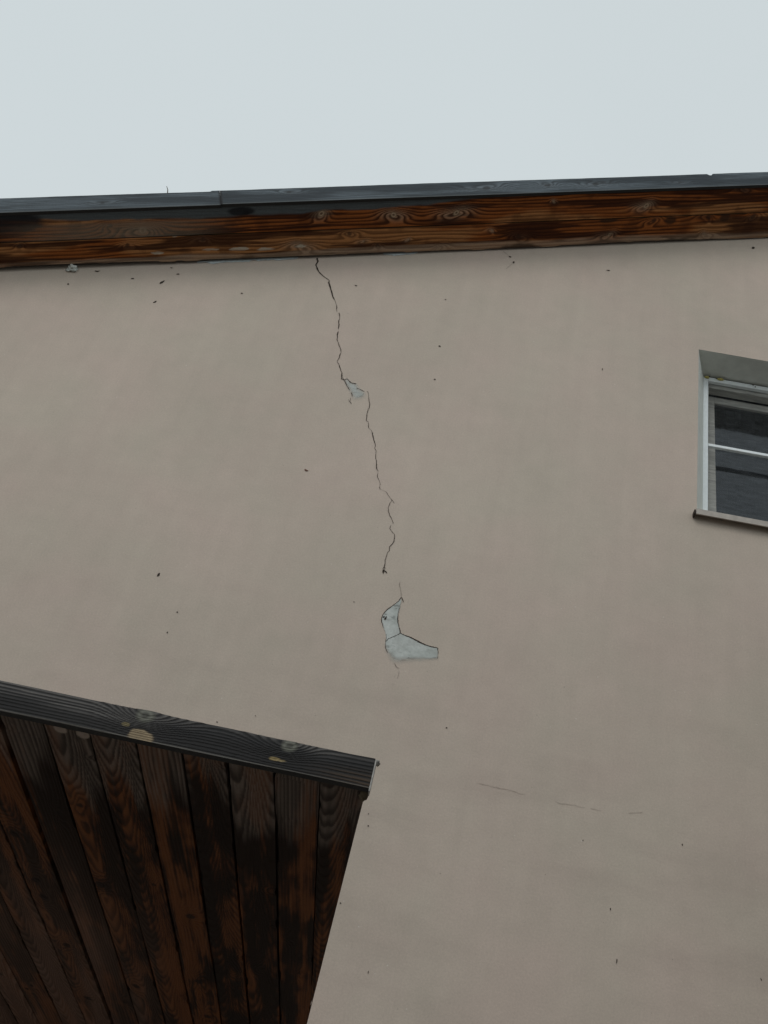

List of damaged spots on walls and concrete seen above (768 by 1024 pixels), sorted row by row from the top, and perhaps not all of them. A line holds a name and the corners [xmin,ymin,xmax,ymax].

crack [315,258,401,590]
peeling [381,598,439,660]